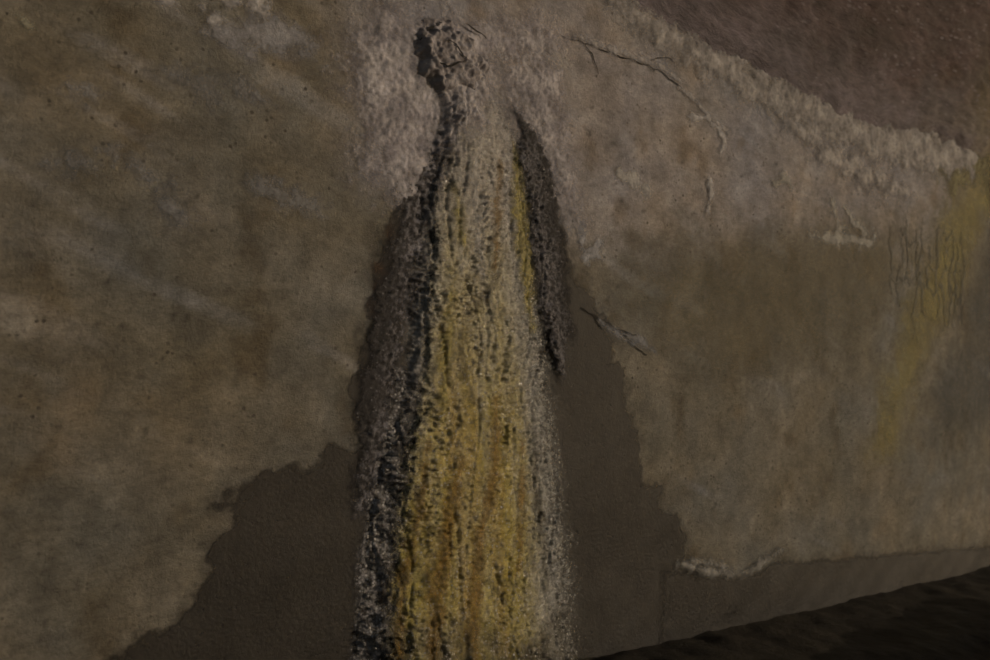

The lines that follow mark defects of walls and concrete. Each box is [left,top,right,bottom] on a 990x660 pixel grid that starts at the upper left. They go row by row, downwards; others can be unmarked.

crack [559,33,699,105]
water stain [573,0,990,199]
water stain [809,198,876,247]
water stain [110,0,694,660]
water stain [661,546,990,643]